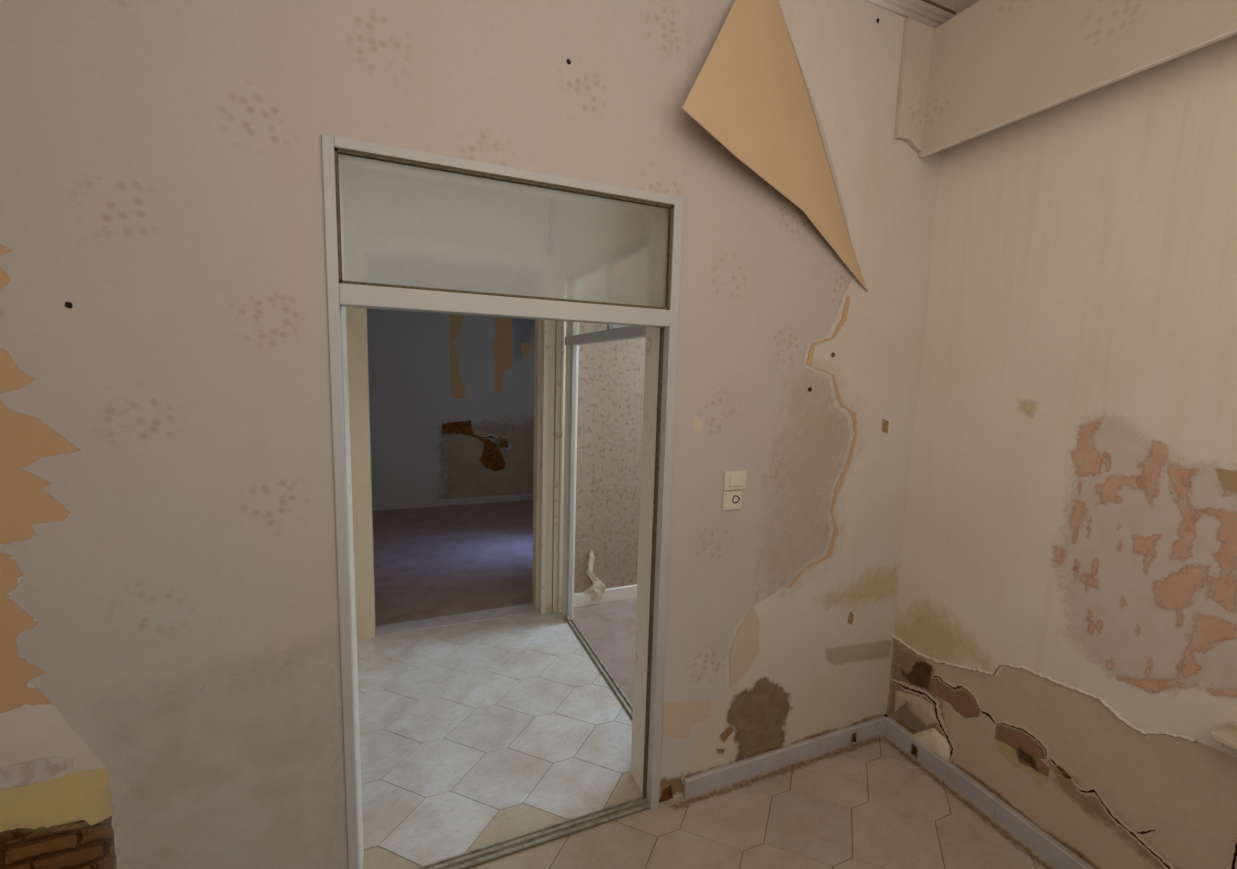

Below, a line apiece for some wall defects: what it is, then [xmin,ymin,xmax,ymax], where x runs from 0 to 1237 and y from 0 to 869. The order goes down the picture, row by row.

peeling [682,0,868,292]
spalling [442,420,511,471]
peeling [1054,417,1237,697]
crack [886,658,957,762]
crack [980,708,997,725]
flaking render [886,635,1237,869]
peeling [0,768,117,869]
crack [1050,758,1175,869]
crack [1225,821,1237,869]